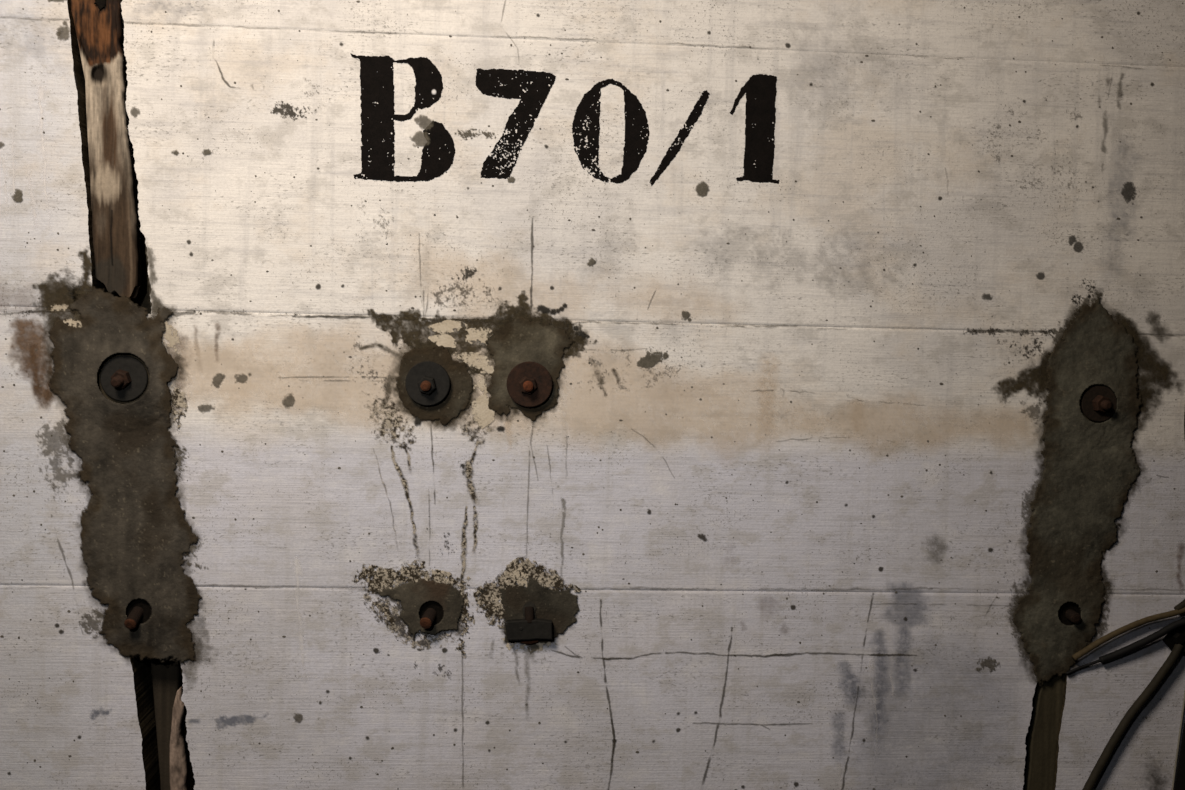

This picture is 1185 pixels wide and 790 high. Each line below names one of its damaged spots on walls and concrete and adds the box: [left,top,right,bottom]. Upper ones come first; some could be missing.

corrosion [11,320,53,404]
peeling [1,298,82,388]
peeling [385,238,519,437]
spalling [537,276,594,364]
peeling [963,316,1053,364]
spalling [335,516,602,676]
crack [556,600,905,790]